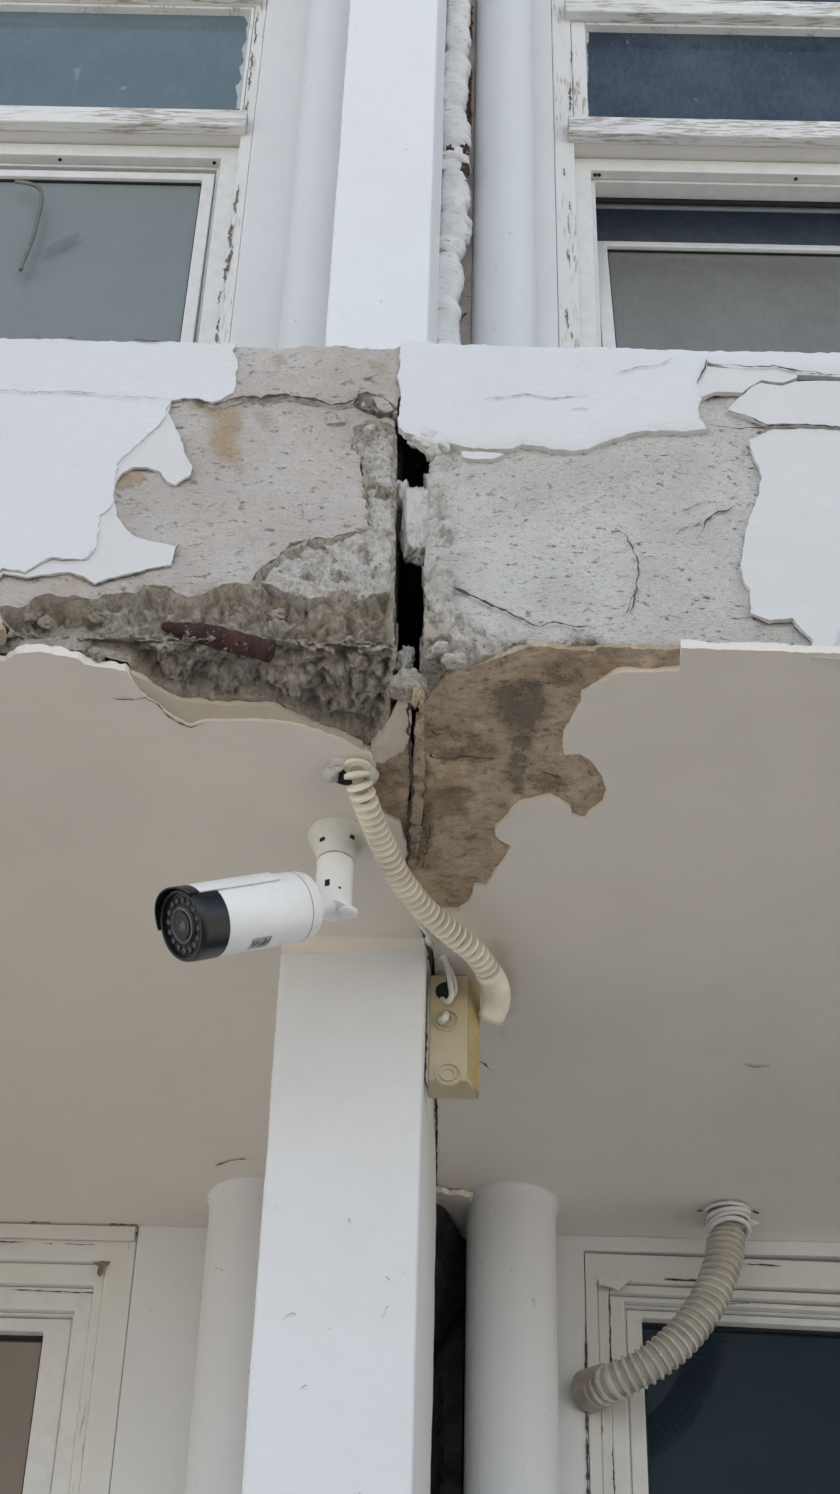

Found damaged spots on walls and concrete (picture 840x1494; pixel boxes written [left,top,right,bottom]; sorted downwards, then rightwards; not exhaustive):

peeling [244,13,258,110]
peeling [215,184,240,343]
peeling [0,345,812,908]
leakage [433,660,582,794]